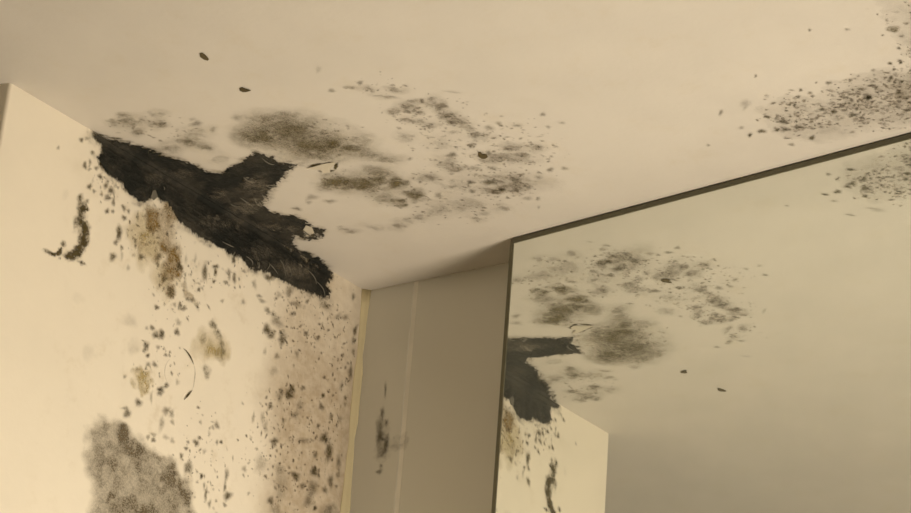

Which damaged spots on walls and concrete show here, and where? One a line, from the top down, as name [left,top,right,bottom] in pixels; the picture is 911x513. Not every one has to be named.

damp [247,120,360,152]
damp [749,62,911,140]
damp [325,174,422,206]
damp [51,196,90,263]
damp [84,152,200,309]
damp [93,411,201,513]